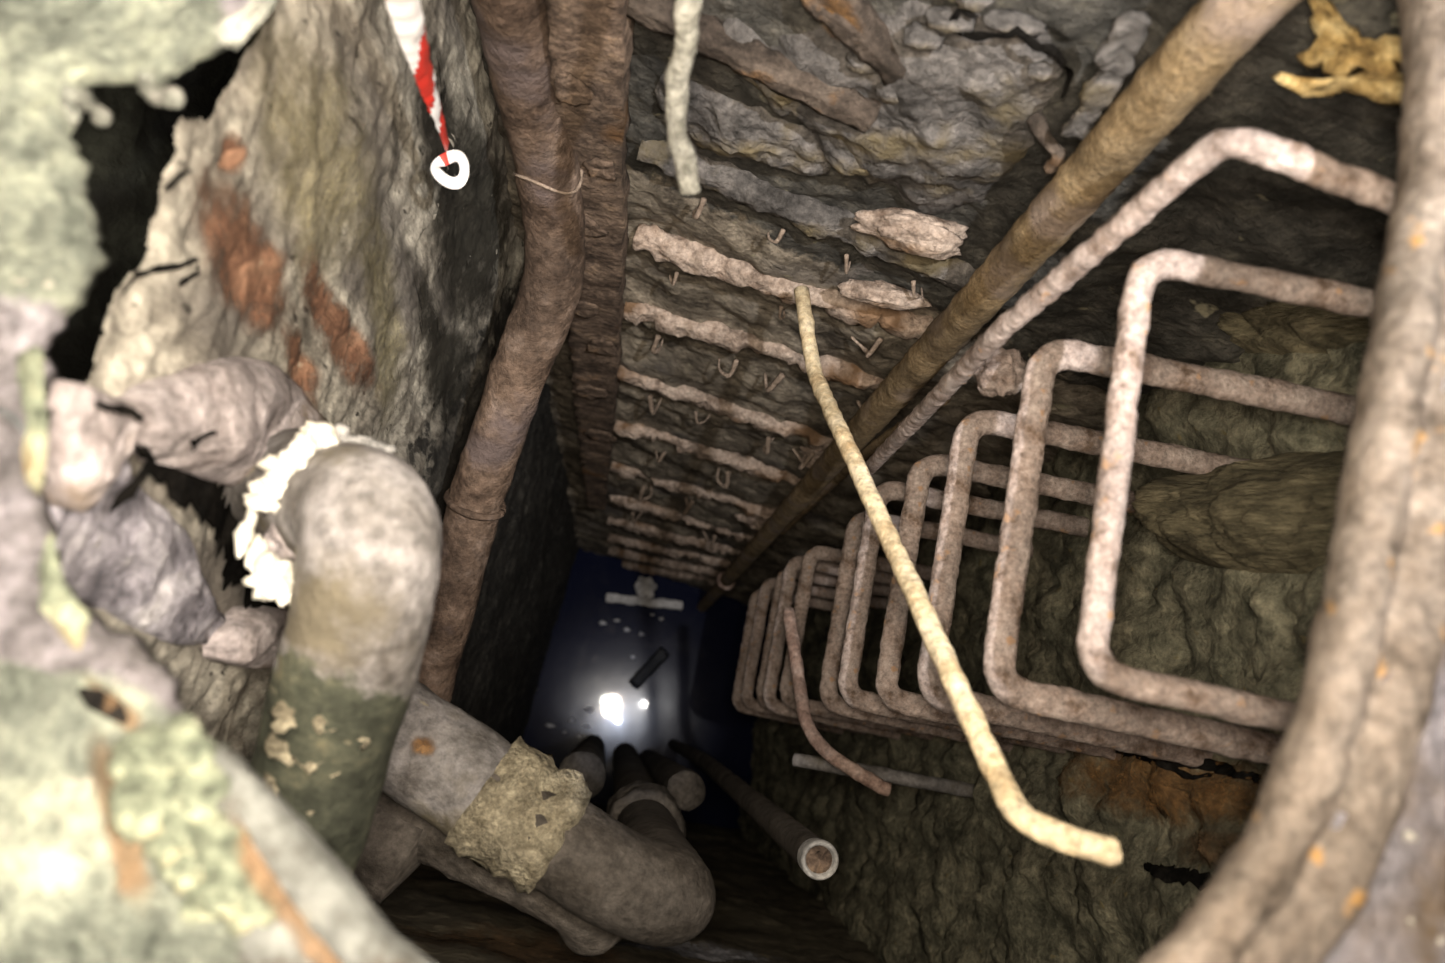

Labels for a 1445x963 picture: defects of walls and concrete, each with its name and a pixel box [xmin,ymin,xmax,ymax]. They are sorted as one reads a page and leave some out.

corrosion [217,133,247,171]
corrosion [200,188,284,328]
corrosion [287,333,318,403]
corrosion [305,262,375,386]